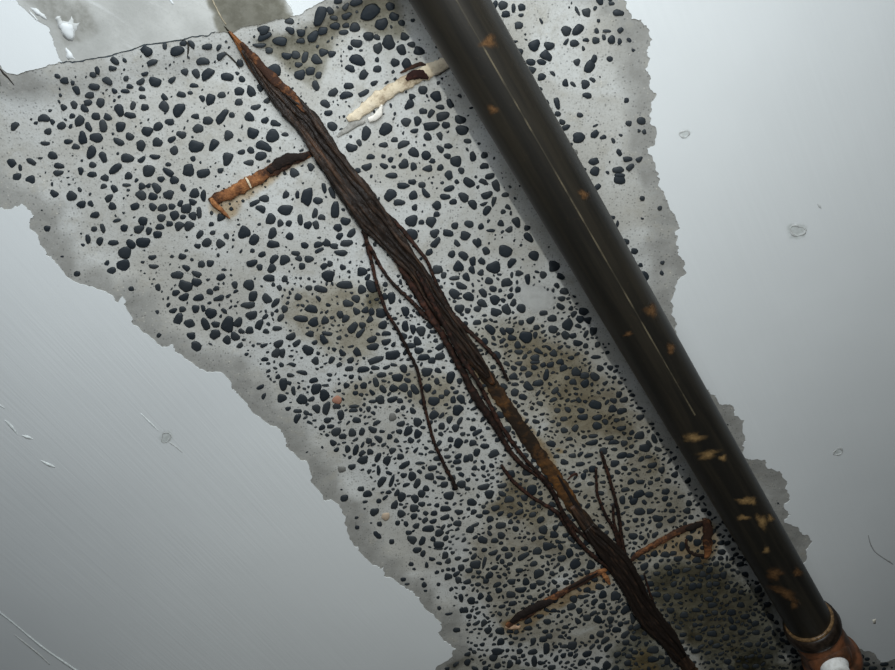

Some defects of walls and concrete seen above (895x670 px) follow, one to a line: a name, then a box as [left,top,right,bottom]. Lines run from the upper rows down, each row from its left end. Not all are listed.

rust [240,42,305,113]
rust [400,62,429,81]
rust [208,151,313,219]
spalling [0,0,686,670]
rust [474,366,597,526]
spalling [708,390,812,563]
rust [631,518,713,562]
rust [505,568,611,630]
spalling [860,649,895,670]